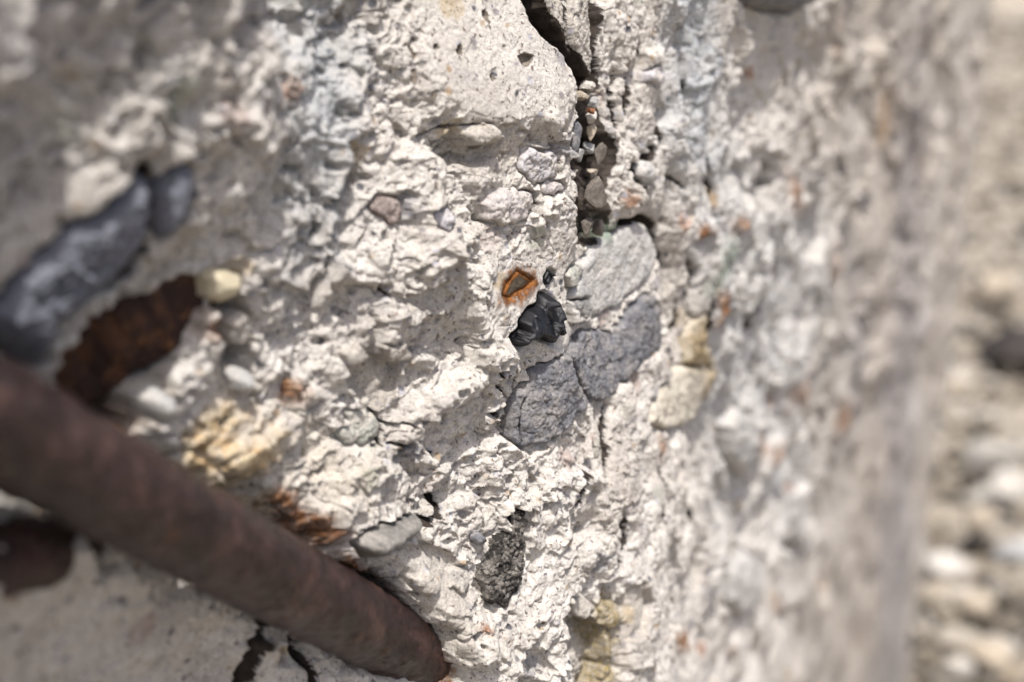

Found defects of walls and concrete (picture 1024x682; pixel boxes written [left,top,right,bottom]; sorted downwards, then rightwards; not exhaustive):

crack [520,0,730,332]
rust [498,266,539,306]
spalling [90,335,183,432]
rust [0,273,452,682]
crack [231,619,319,682]